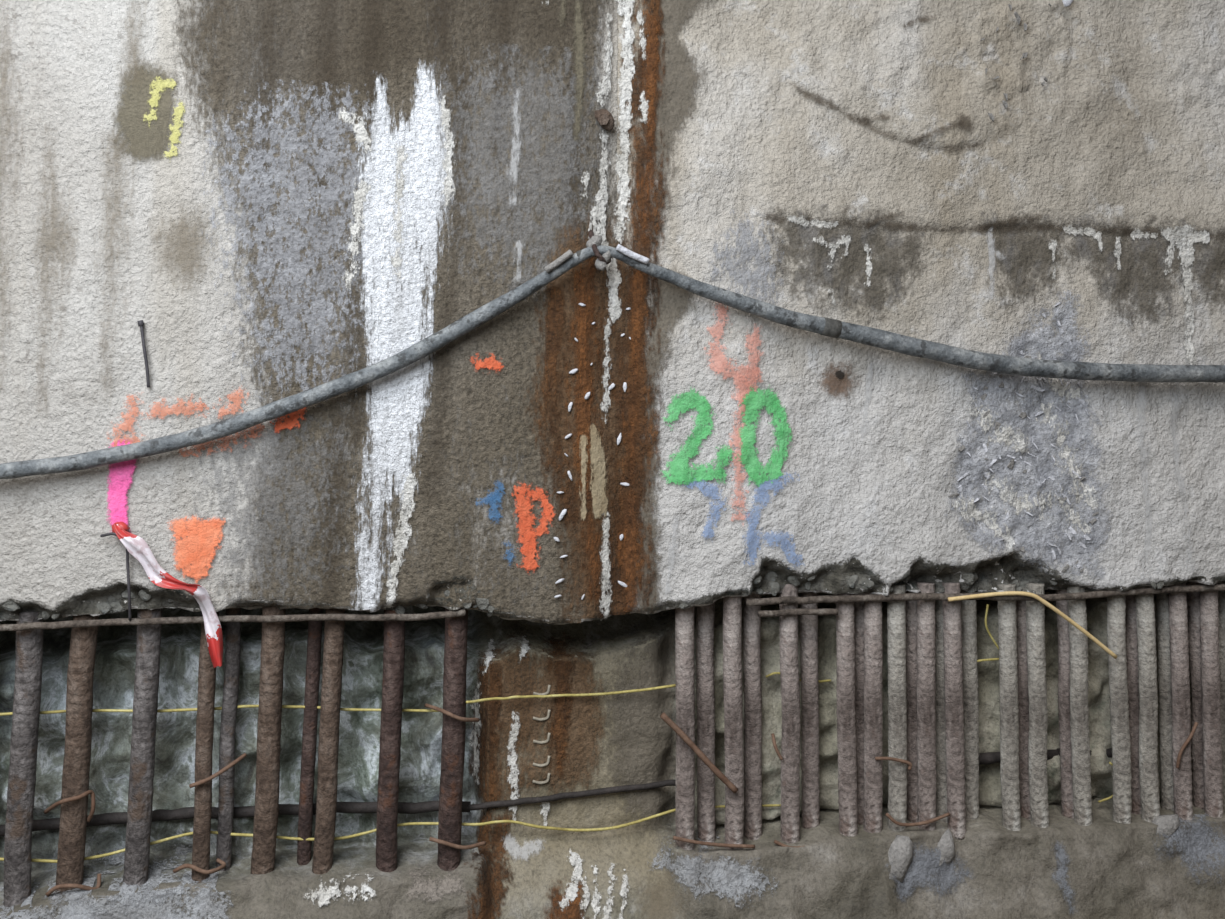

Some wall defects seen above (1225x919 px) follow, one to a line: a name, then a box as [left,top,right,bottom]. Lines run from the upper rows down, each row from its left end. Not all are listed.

water stain [114,63,175,160]
water stain [763,205,926,321]
peeling [1003,290,1090,362]
water stain [979,212,1225,365]
water stain [178,0,779,919]
corrosion [467,0,668,919]
peeling [0,369,1225,908]